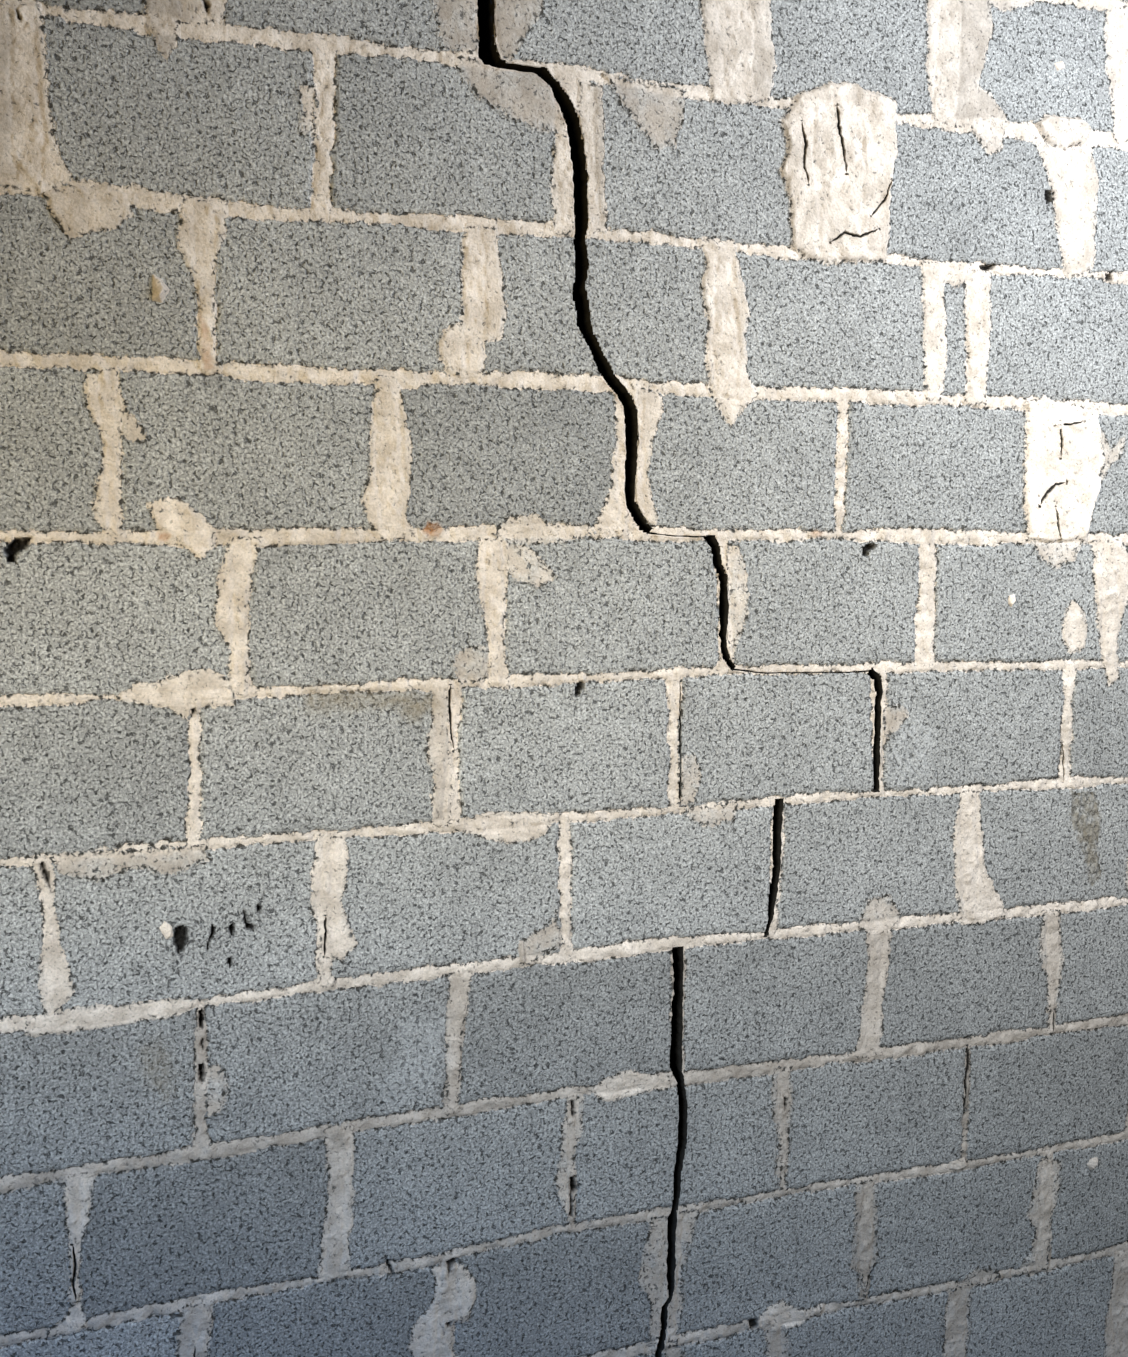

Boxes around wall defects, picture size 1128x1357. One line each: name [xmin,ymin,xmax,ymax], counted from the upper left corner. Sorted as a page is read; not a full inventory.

crack [475,0,885,802]
crack [447,685,458,750]
crack [761,798,786,938]
crack [652,946,690,1357]
crack [864,1263,878,1291]